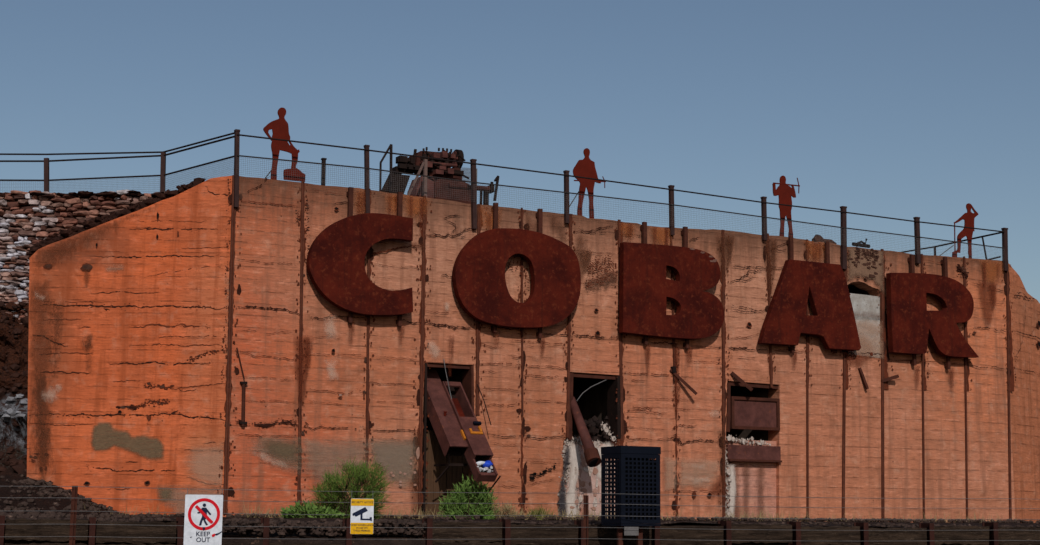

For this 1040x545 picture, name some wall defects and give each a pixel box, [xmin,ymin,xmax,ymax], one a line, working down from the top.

crack [208,176,360,206]
crack [29,220,417,490]
corrosion [297,338,310,397]
leakage [91,423,163,458]
peeling [568,449,615,517]